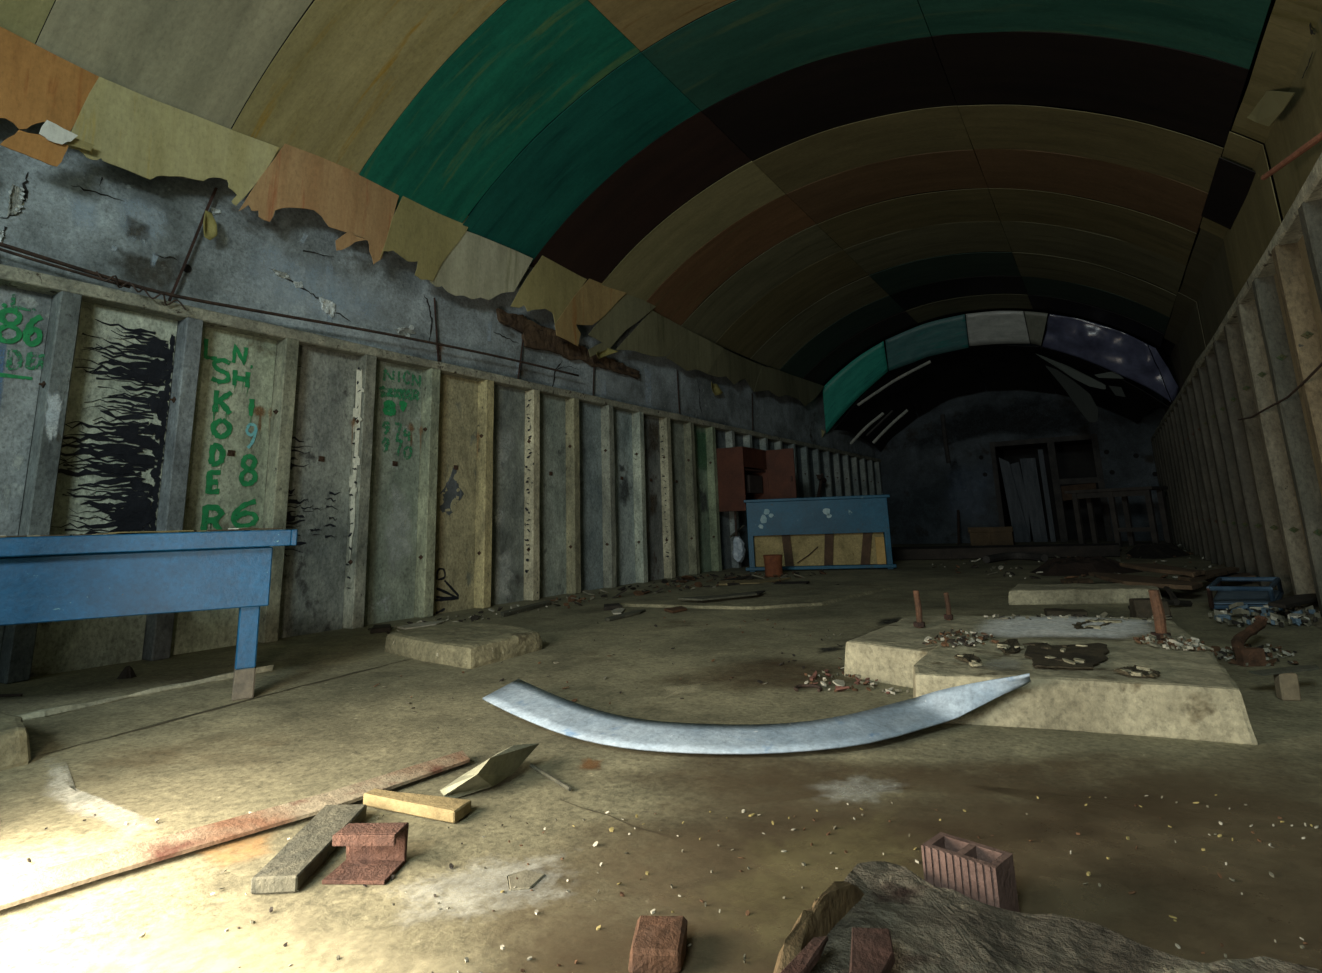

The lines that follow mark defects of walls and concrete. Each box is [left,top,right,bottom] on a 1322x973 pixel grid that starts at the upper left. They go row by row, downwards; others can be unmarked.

spalling [0,184,25,242]
rust [168,187,218,302]